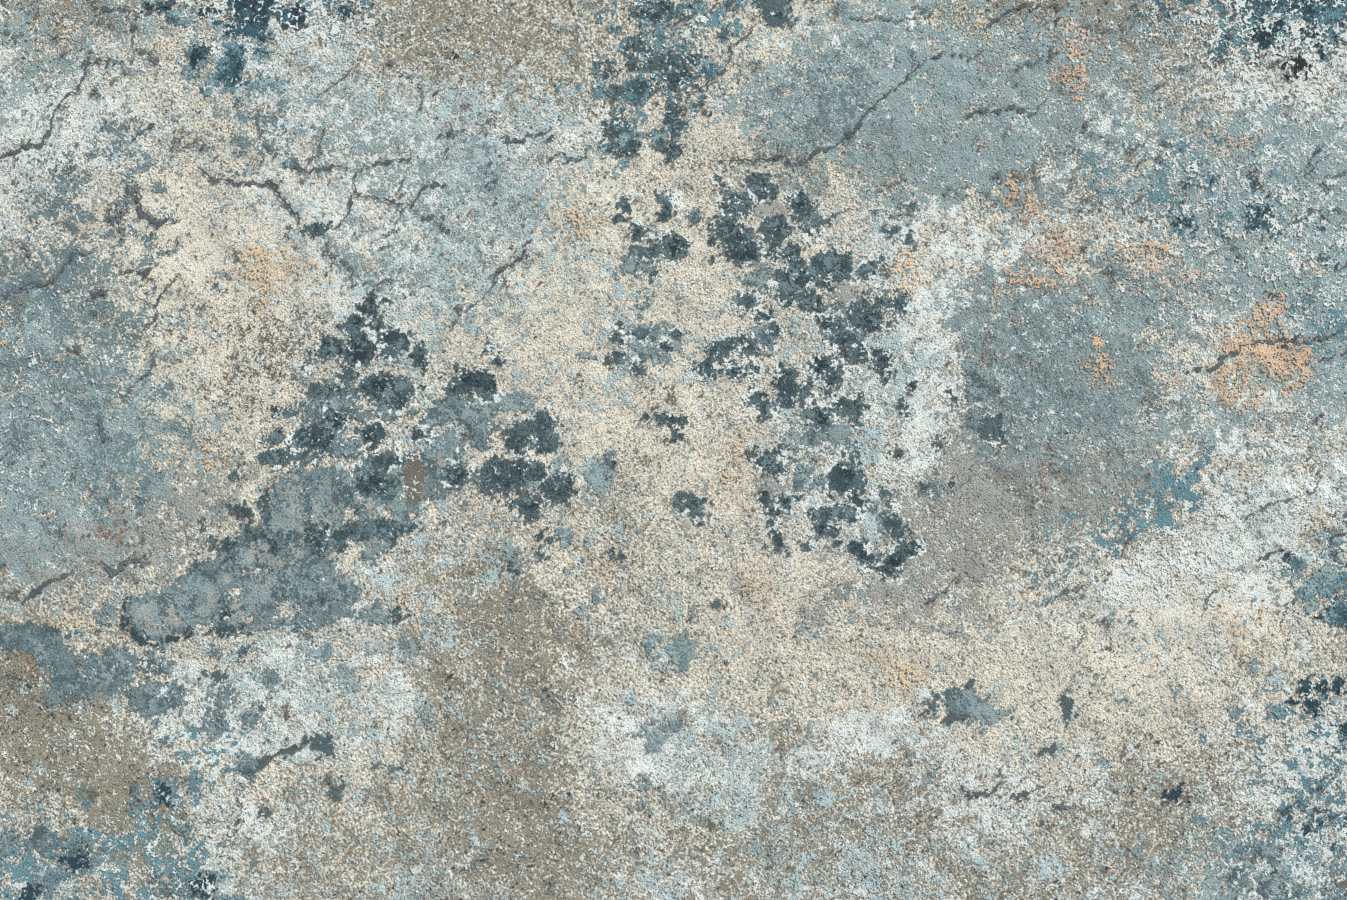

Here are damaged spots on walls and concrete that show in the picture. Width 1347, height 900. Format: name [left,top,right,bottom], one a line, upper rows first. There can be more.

crack [0,0,208,158]
crack [664,0,933,97]
crack [131,59,466,289]
crack [483,127,588,191]
crack [709,3,1347,374]
crack [450,239,533,331]
rust [1207,289,1325,417]
crack [1245,453,1323,521]
crack [926,576,967,603]
crack [1202,549,1296,615]